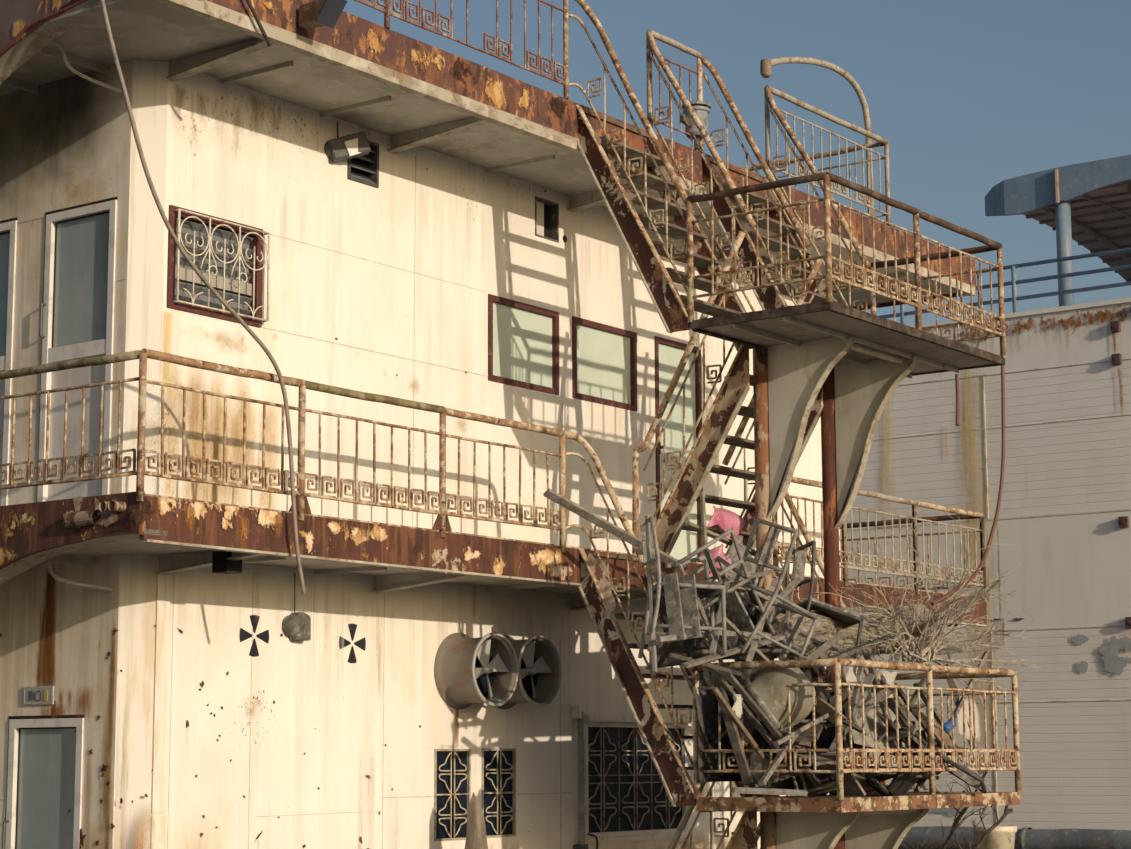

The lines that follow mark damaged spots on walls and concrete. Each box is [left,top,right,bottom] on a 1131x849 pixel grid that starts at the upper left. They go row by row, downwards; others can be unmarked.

peeling [362,29,381,54]
peeling [411,49,531,120]
peeling [550,97,568,118]
corrosion [960,305,1131,353]
corrosion [194,408,273,501]
peeling [0,512,37,564]
peeling [62,496,285,538]
peeling [299,531,315,554]
peeling [326,521,388,562]
corrosion [38,571,89,719]
peeling [1072,634,1131,676]
corrosion [105,636,115,849]